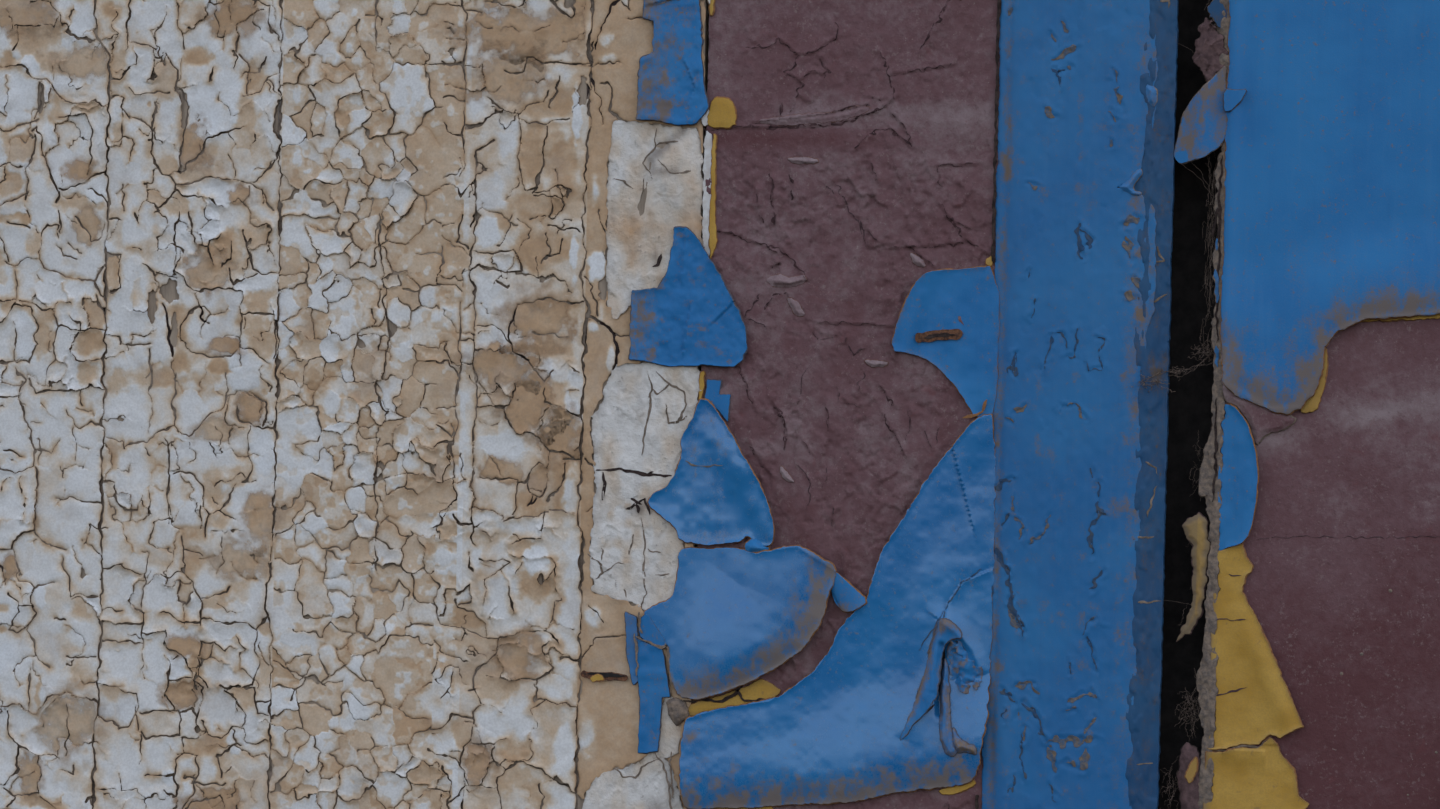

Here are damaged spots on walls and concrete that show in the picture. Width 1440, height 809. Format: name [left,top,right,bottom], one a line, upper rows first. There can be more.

crack [0,0,326,809]
crack [374,217,392,571]
peeling [0,0,1051,809]
peeling [1176,403,1259,642]